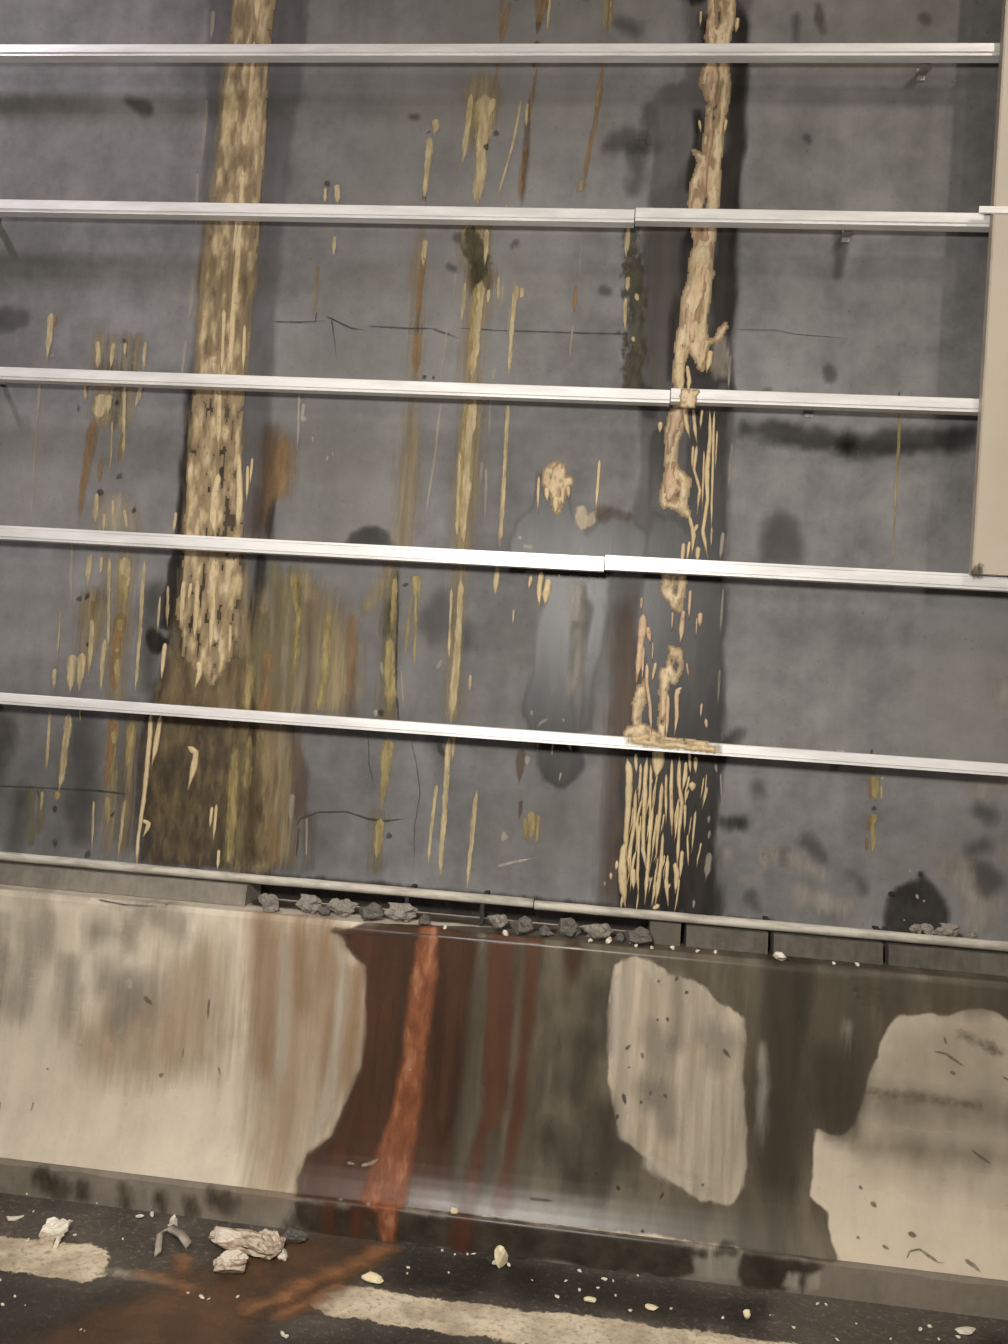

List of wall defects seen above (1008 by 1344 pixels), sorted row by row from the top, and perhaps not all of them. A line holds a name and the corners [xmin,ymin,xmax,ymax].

water stain [230,0,276,44]
water stain [690,0,747,43]
water stain [203,63,268,203]
water stain [323,181,340,203]
water stain [412,116,439,205]
water stain [462,63,537,207]
water stain [578,63,604,191]
water stain [687,63,748,209]
water stain [28,219,1008,1289]
corrosion [274,925,543,1213]